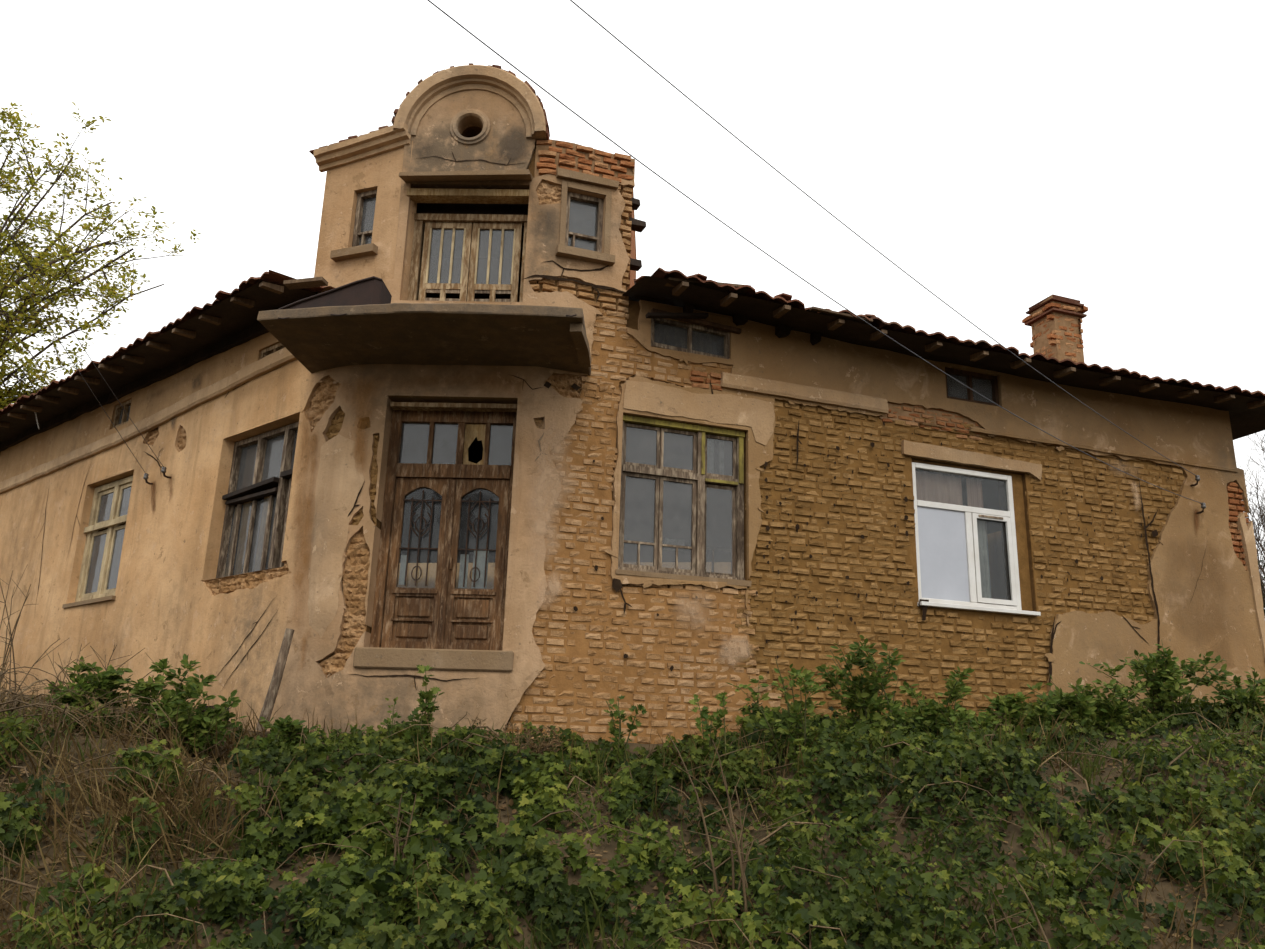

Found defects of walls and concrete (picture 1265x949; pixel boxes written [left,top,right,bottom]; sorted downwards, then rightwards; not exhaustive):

flaking render [203,561,292,596]
flaking render [301,377,345,439]
flaking render [319,419,379,678]
flaking render [504,139,1185,745]
crack [1123,477,1160,651]
flaking render [1227,482,1249,571]